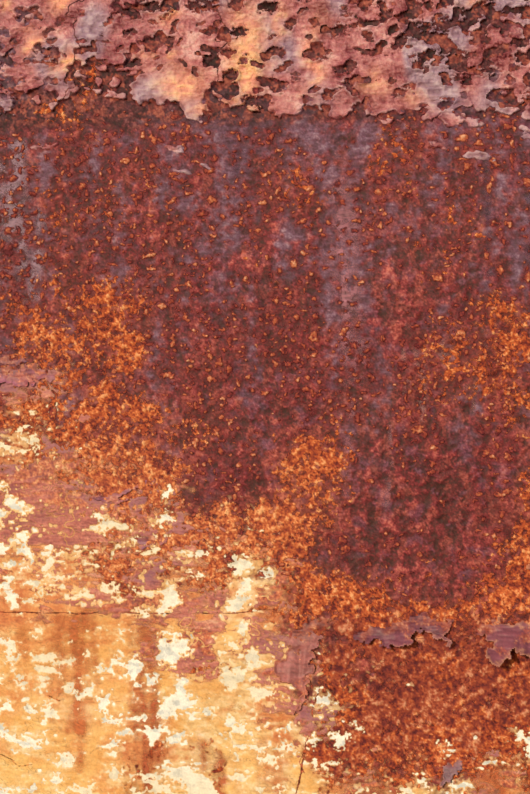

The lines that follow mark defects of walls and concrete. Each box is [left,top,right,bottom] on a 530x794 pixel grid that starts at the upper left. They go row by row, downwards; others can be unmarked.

peeling [0,0,530,139]
corrosion [29,63,194,257]
corrosion [223,115,345,266]
corrosion [318,110,530,238]
corrosion [0,166,530,794]
crack [0,609,99,617]
peeling [0,354,380,794]
crack [197,607,279,615]
peeling [353,612,455,649]
peeling [476,617,530,667]
crack [296,736,309,793]
peeling [413,730,530,794]